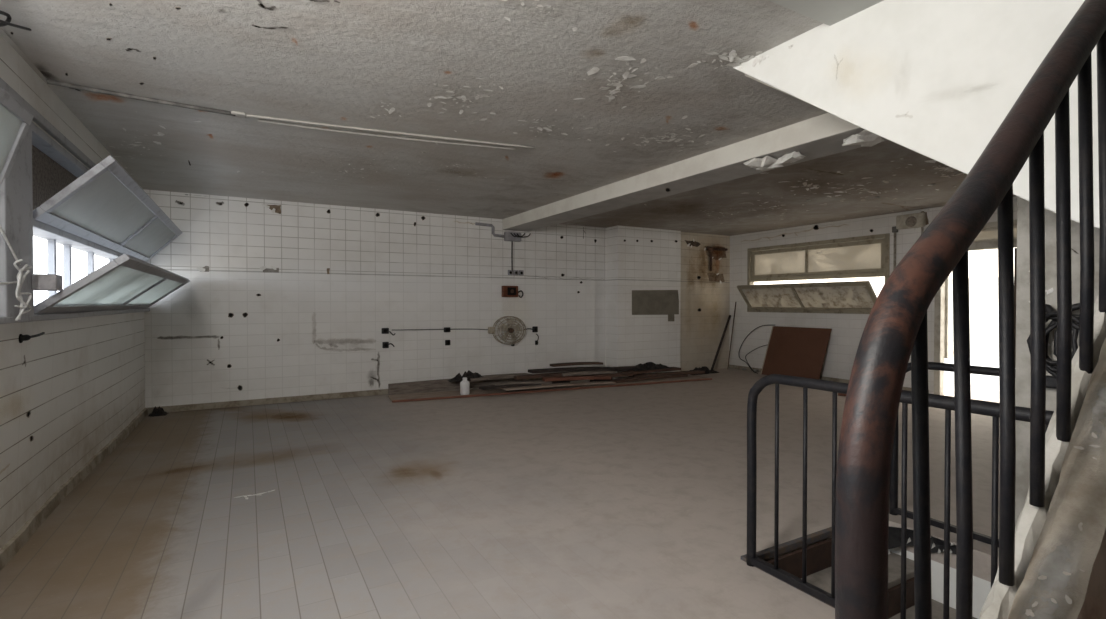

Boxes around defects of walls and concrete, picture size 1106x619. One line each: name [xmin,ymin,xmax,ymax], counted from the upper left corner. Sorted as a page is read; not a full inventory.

peeling [416,78,503,121]
peeling [573,56,674,109]
spalling [842,130,884,147]
spalling [743,151,806,174]